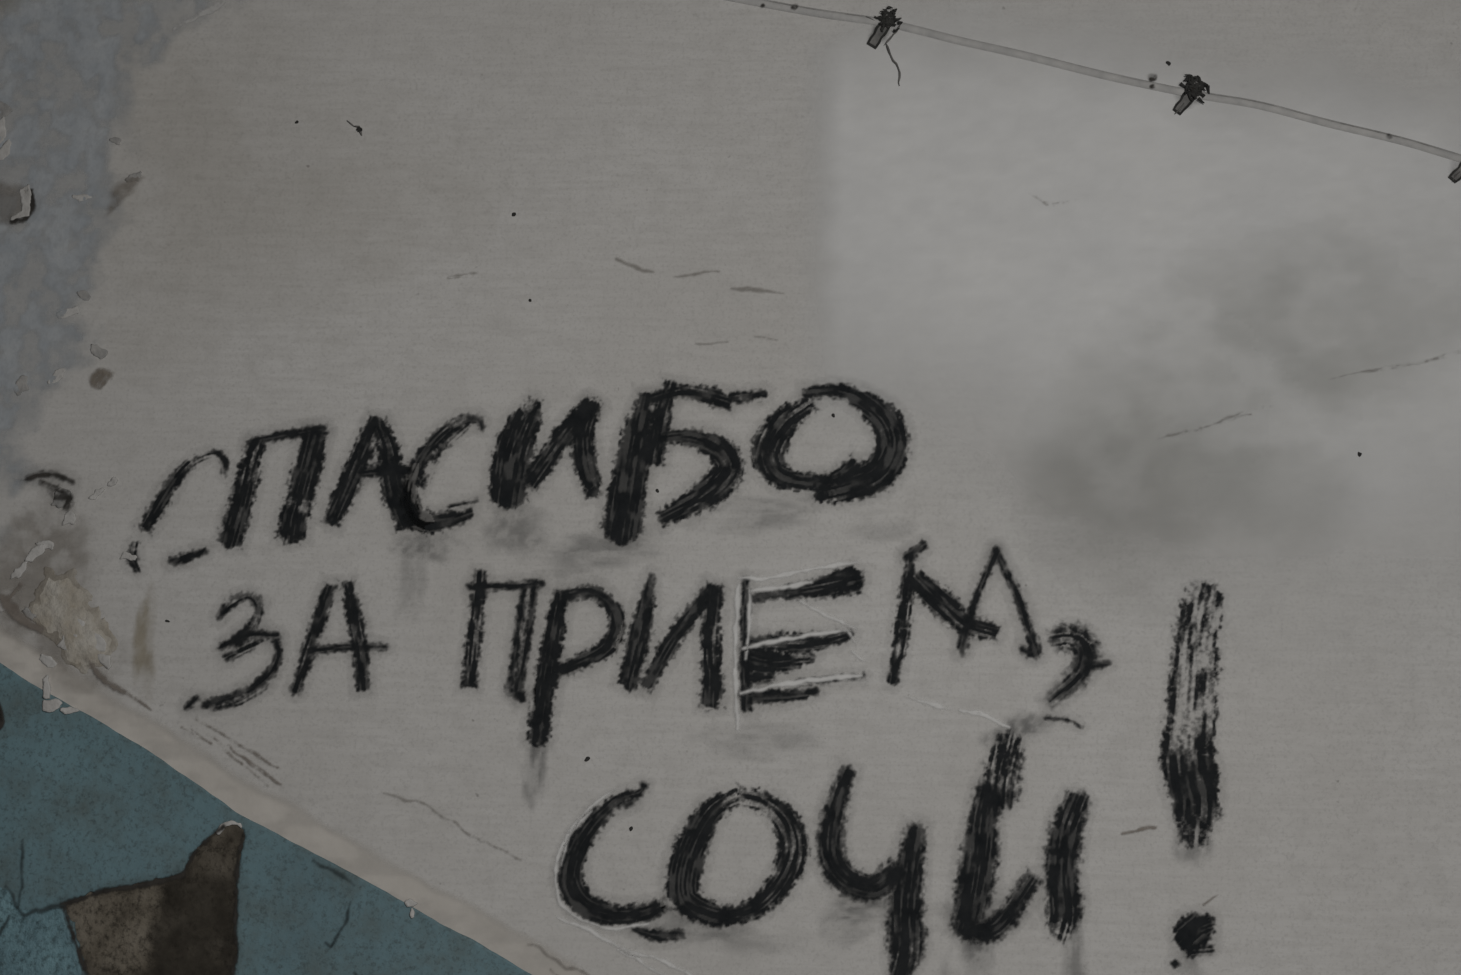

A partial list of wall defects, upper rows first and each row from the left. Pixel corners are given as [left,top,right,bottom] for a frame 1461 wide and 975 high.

flaking render [60,820,245,975]